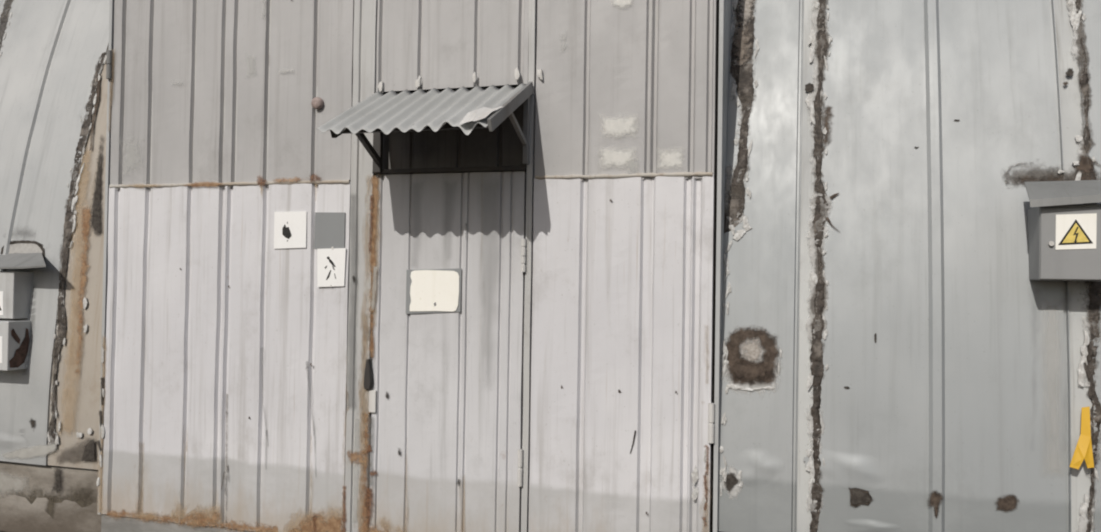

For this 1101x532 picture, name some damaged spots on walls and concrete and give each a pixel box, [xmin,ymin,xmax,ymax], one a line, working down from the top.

crack [1,240,45,259]
corrosion [76,208,91,373]
corrosion [369,177,379,357]
peeling [723,216,752,314]
peeling [721,341,774,394]
corrosion [57,438,92,463]
corrosion [107,487,347,532]
corrosion [347,413,389,532]
peeling [691,446,742,523]